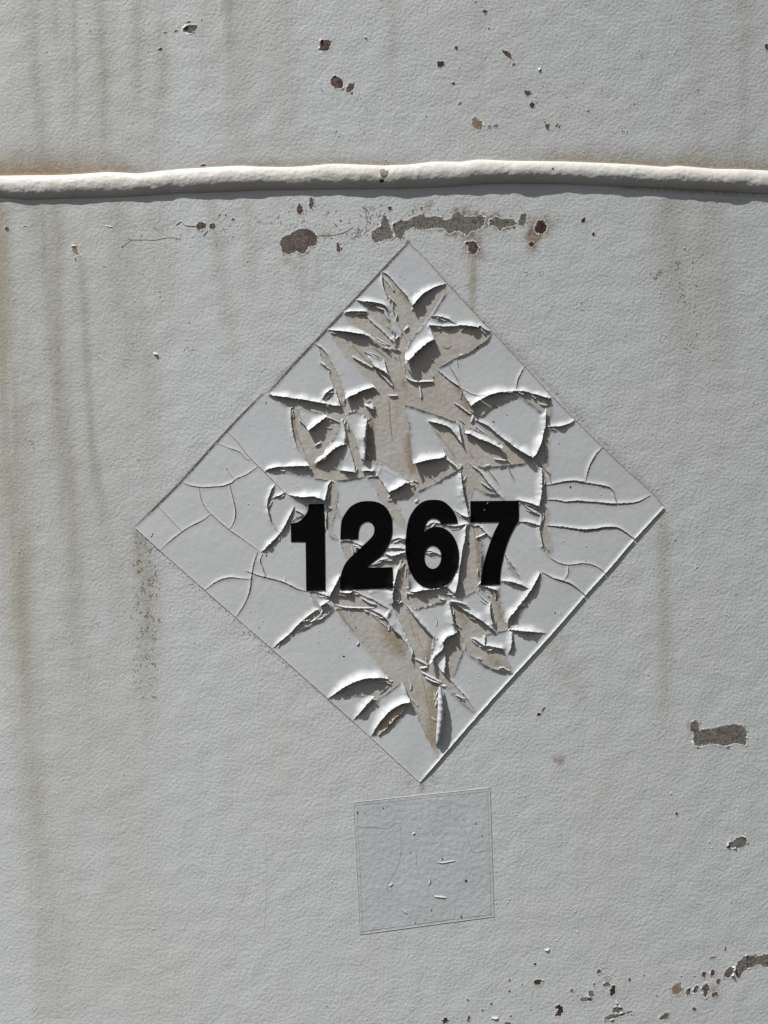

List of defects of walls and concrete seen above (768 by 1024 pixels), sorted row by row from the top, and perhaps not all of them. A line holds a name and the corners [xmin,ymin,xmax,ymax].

peeling [278,195,319,256]
peeling [372,205,393,243]
peeling [490,214,549,248]
crack [159,432,306,617]
peeling [261,272,575,761]
crack [534,448,650,540]
crack [542,558,606,597]
peeling [688,718,750,749]
peeling [724,835,749,851]
peeling [553,1003,565,1018]
peeling [569,968,646,1023]
peeling [655,945,757,1012]